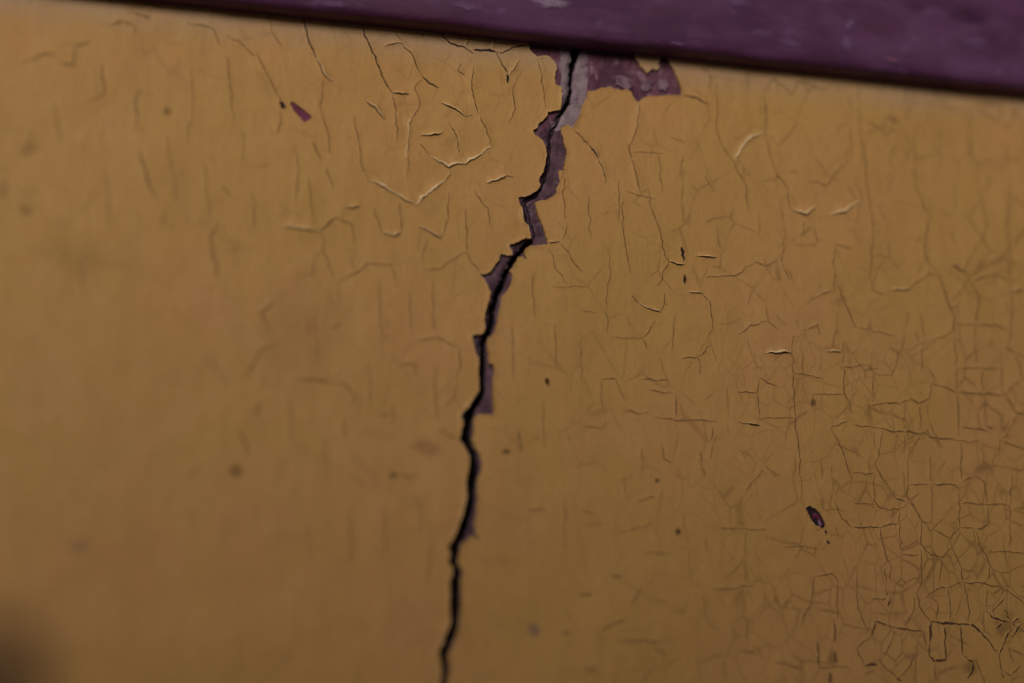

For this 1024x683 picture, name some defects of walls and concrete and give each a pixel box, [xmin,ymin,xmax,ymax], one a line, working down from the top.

peeling [278,99,315,124]
crack [299,18,335,160]
crack [359,25,528,178]
peeling [526,43,561,90]
peeling [586,51,685,102]
crack [941,88,970,103]
crack [434,48,864,683]
peeling [804,504,832,546]
crack [831,455,937,568]
crack [852,607,1024,683]